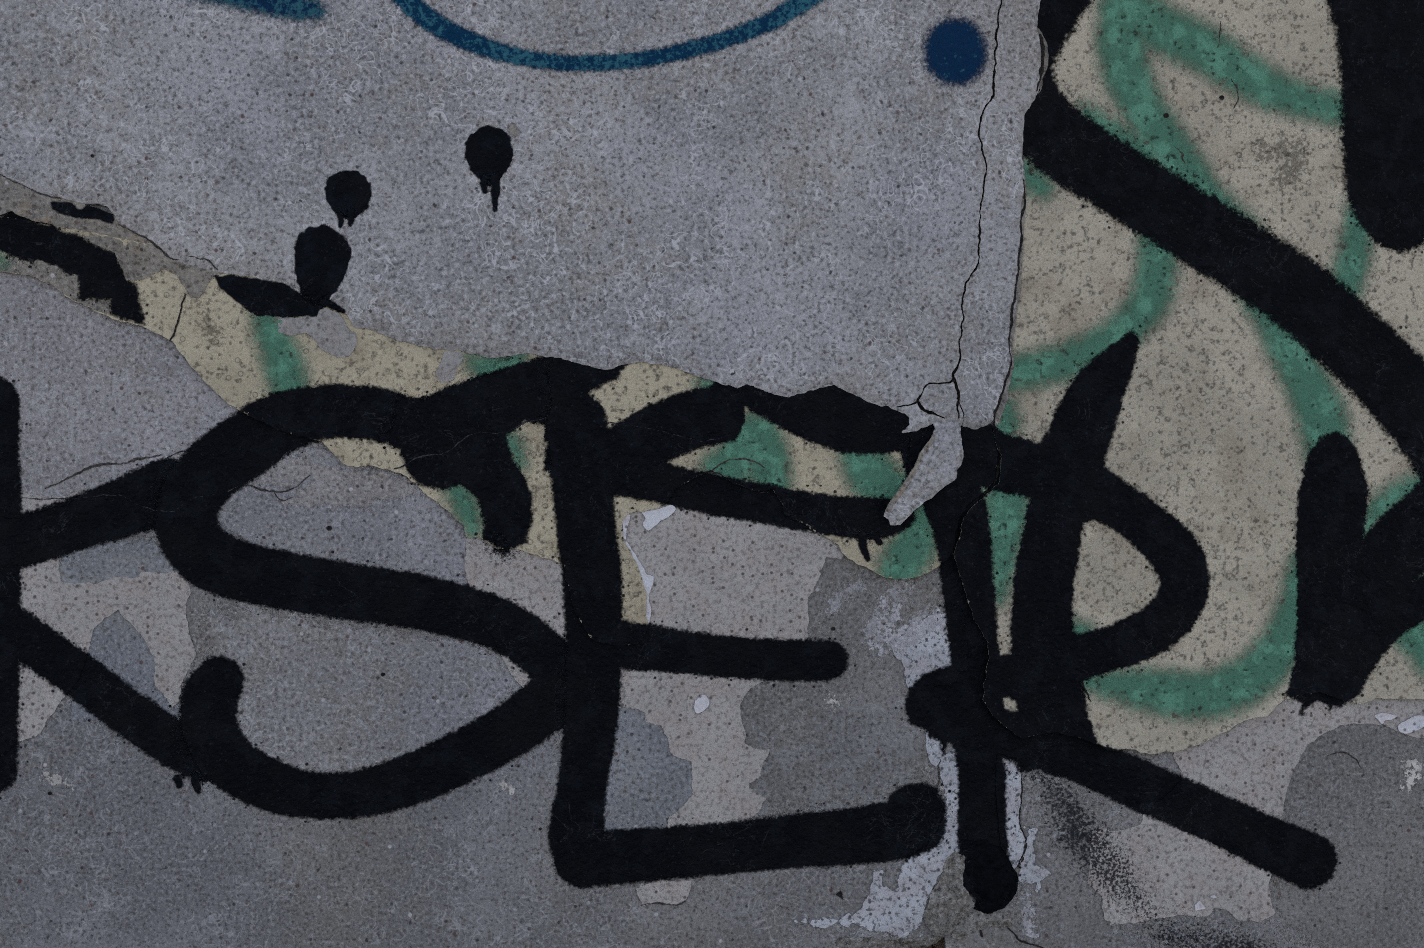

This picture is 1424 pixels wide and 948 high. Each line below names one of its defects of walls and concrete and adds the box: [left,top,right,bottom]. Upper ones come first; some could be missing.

peeling [0,256,238,513]
peeling [277,308,357,357]
peeling [217,441,567,641]
peeling [884,421,964,525]
crack [901,0,1026,555]
peeling [603,504,1051,948]